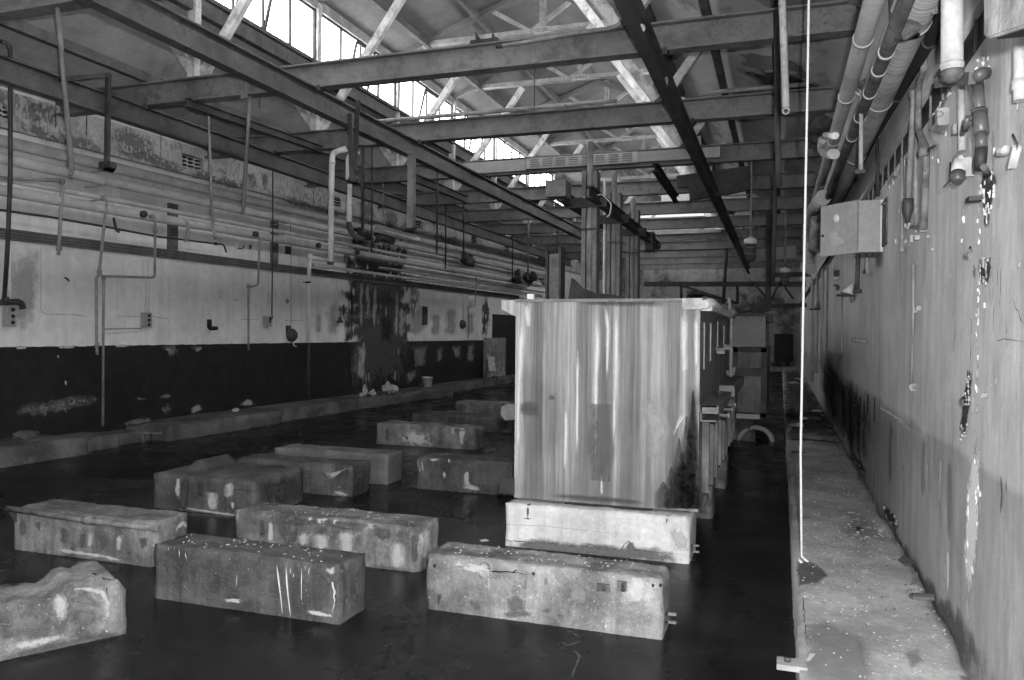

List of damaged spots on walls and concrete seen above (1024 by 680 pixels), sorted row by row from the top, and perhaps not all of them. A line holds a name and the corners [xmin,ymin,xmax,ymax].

peeling [962,132,996,245]
leakage [783,364,905,453]
peeling [959,257,997,623]